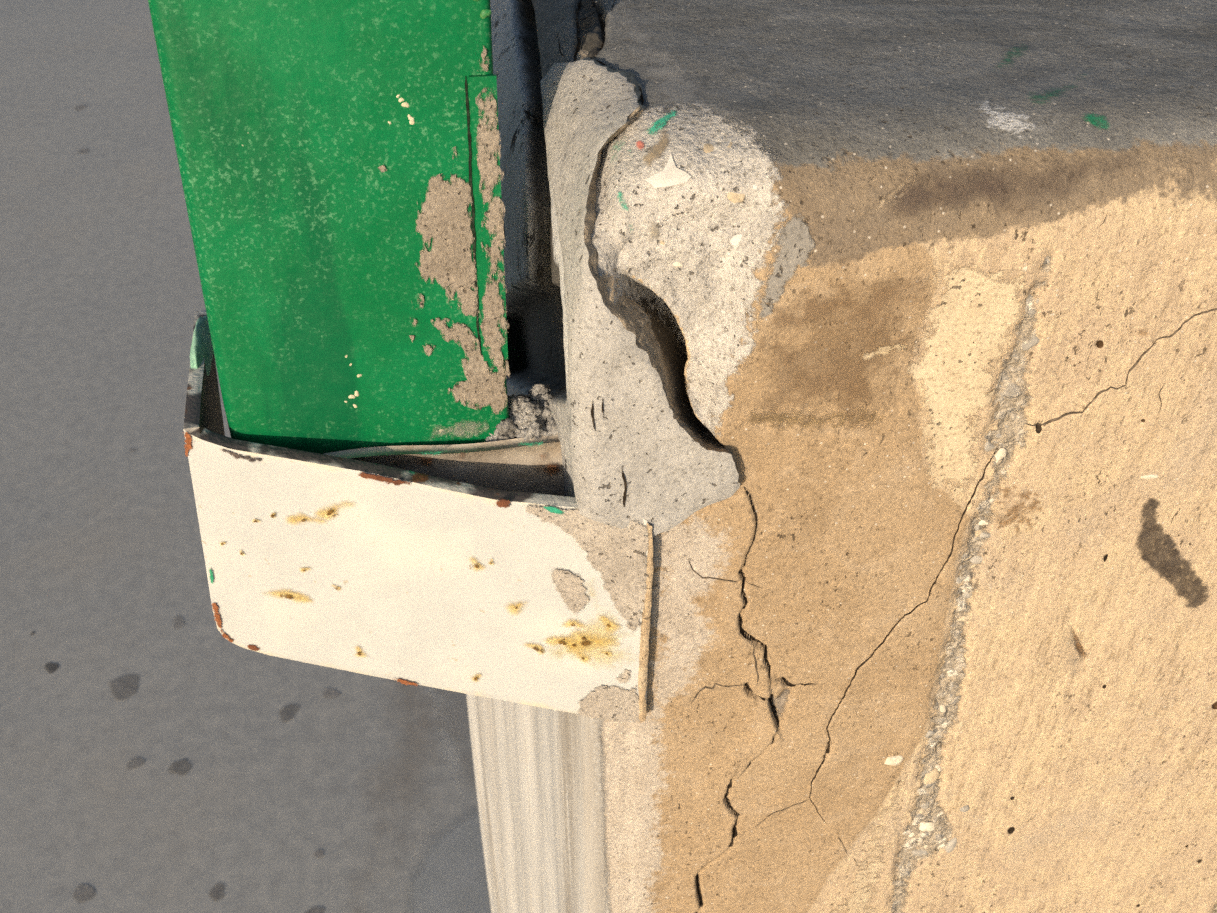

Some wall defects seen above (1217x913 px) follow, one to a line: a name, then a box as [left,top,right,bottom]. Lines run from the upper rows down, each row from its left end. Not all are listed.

peeling [409,88,510,415]
corrosion [541,456,560,474]
corrosion [253,504,349,523]
water stain [1138,499,1207,608]
corrosion [272,591,310,602]
crack [689,308,1217,913]
corrosion [527,618,618,662]